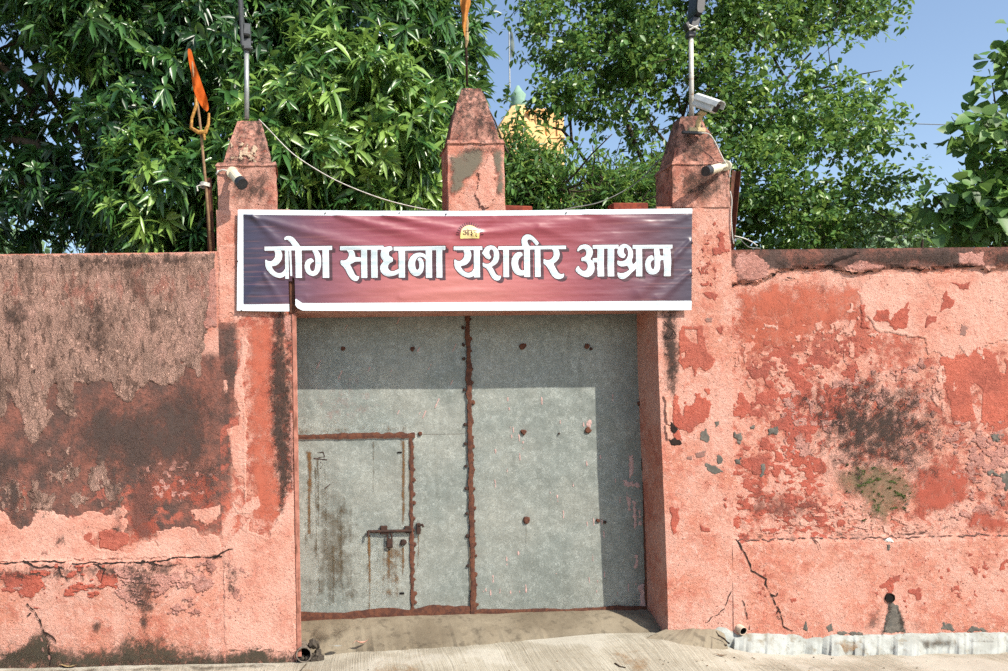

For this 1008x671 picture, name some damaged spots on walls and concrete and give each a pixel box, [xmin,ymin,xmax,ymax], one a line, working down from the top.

peeling [475,153,498,208]
peeling [697,222,770,301]
peeling [663,251,1008,543]
leakage [81,389,212,538]
peeling [0,244,324,662]
crack [1,549,231,582]
crack [736,526,1007,631]
peeling [964,553,1008,578]
crack [22,603,56,665]
crack [707,591,750,646]